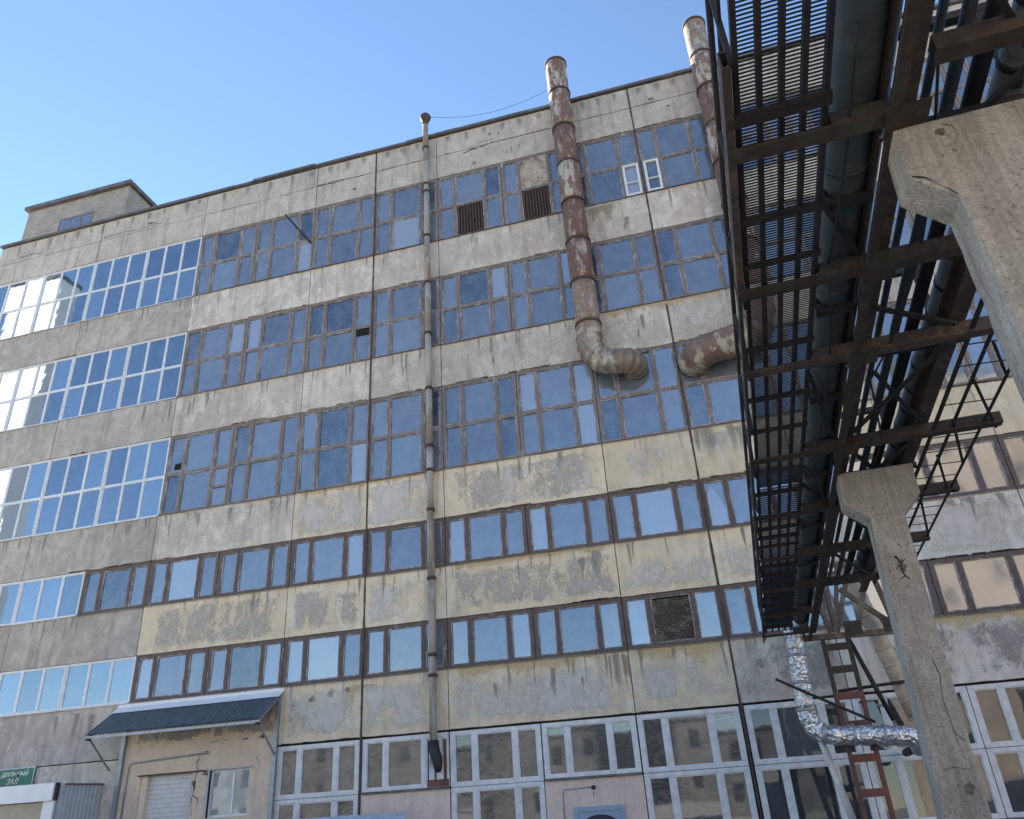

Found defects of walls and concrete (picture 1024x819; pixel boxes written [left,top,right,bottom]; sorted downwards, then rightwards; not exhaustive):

peeling [456,453,595,512]
peeling [457,556,617,606]
crack [894,543,910,580]
peeling [155,598,278,646]
water stain [459,640,720,687]
peeling [456,666,612,719]